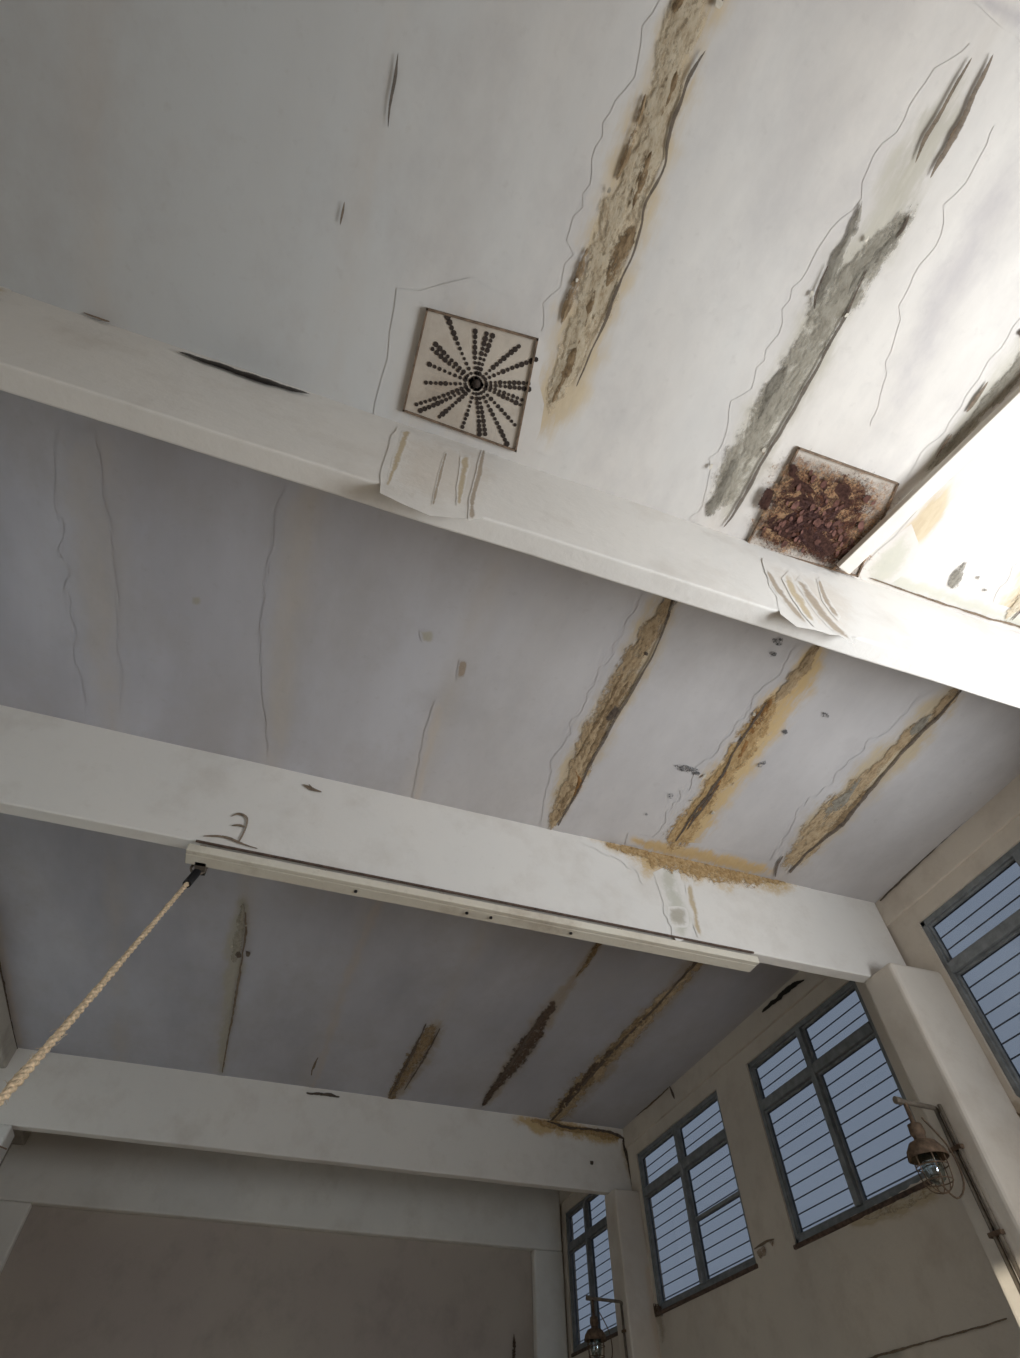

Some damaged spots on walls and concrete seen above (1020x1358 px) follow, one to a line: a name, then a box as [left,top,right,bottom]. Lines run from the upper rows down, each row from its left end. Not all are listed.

crack [388,55,398,126]
crack [180,352,309,394]
spalling [533,0,746,458]
spalling [689,43,994,536]
spalling [908,319,1020,485]
corrosion [749,457,900,644]
spalling [539,592,692,833]
spalling [579,641,971,941]
spalling [383,1014,454,1100]
spalling [476,942,605,1111]
spalling [508,959,714,1165]